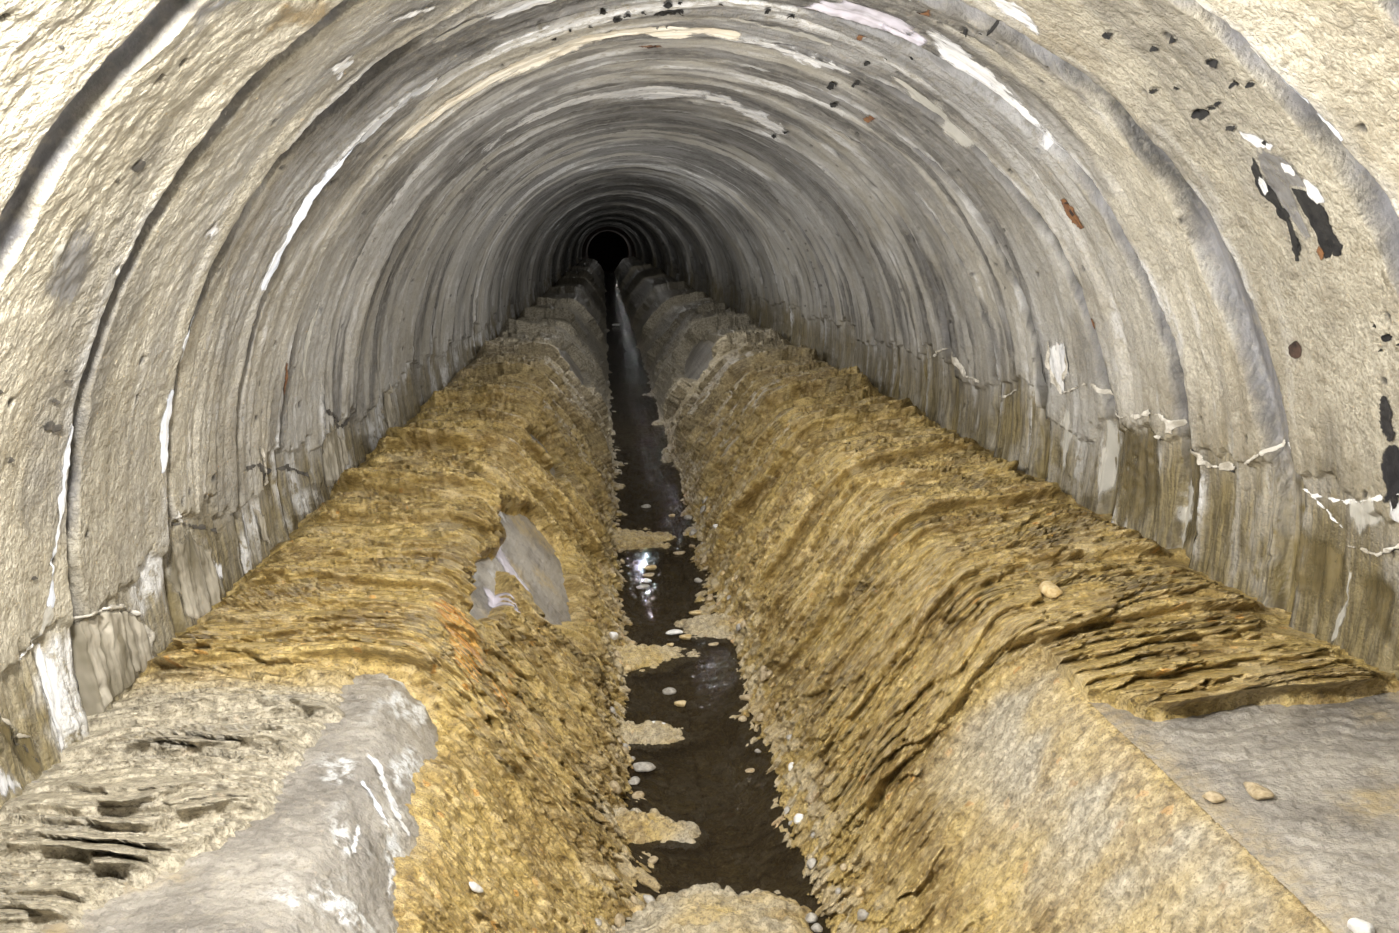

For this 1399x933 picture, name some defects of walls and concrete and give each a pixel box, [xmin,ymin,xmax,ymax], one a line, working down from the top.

water stain [392,7,434,23]
water stain [332,55,353,80]
spalling [1191,81,1254,120]
water stain [261,77,438,291]
peeling [1226,125,1343,261]
crack [1303,489,1399,528]
water stain [0,257,1399,933]